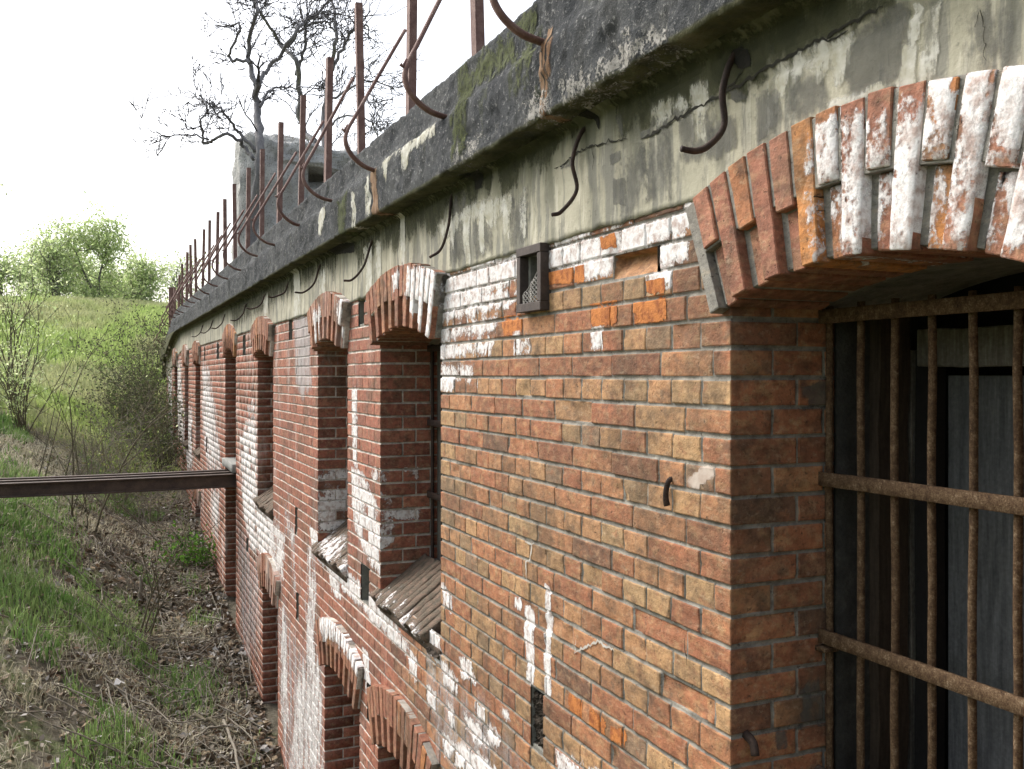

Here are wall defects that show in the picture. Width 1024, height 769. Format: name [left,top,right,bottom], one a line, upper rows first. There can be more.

corrosion [538,27,572,123]
crack [554,6,883,170]
crack [975,10,986,60]
leakage [351,120,579,294]